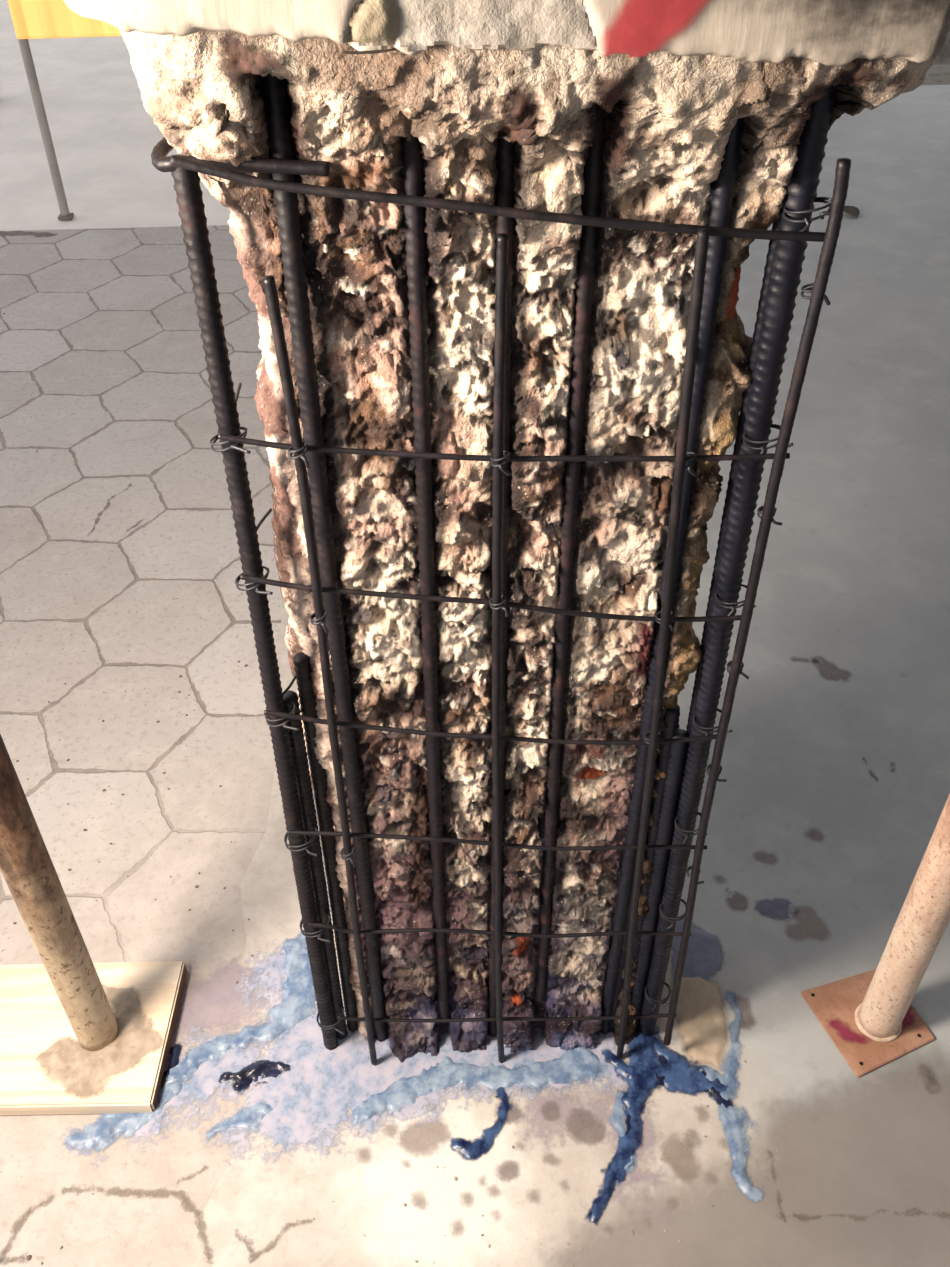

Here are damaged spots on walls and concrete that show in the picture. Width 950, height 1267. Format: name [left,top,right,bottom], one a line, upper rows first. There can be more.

spalling [119,0,934,1062]
damp [792,657,850,680]
damp [717,877,827,939]
damp [387,1122,447,1151]
damp [506,1103,520,1123]
damp [543,1103,604,1143]
damp [500,1162,518,1179]
damp [559,1063,950,1267]
crack [768,1151,864,1221]
crack [0,1167,211,1264]
crack [906,1209,950,1217]
crack [238,1220,312,1263]